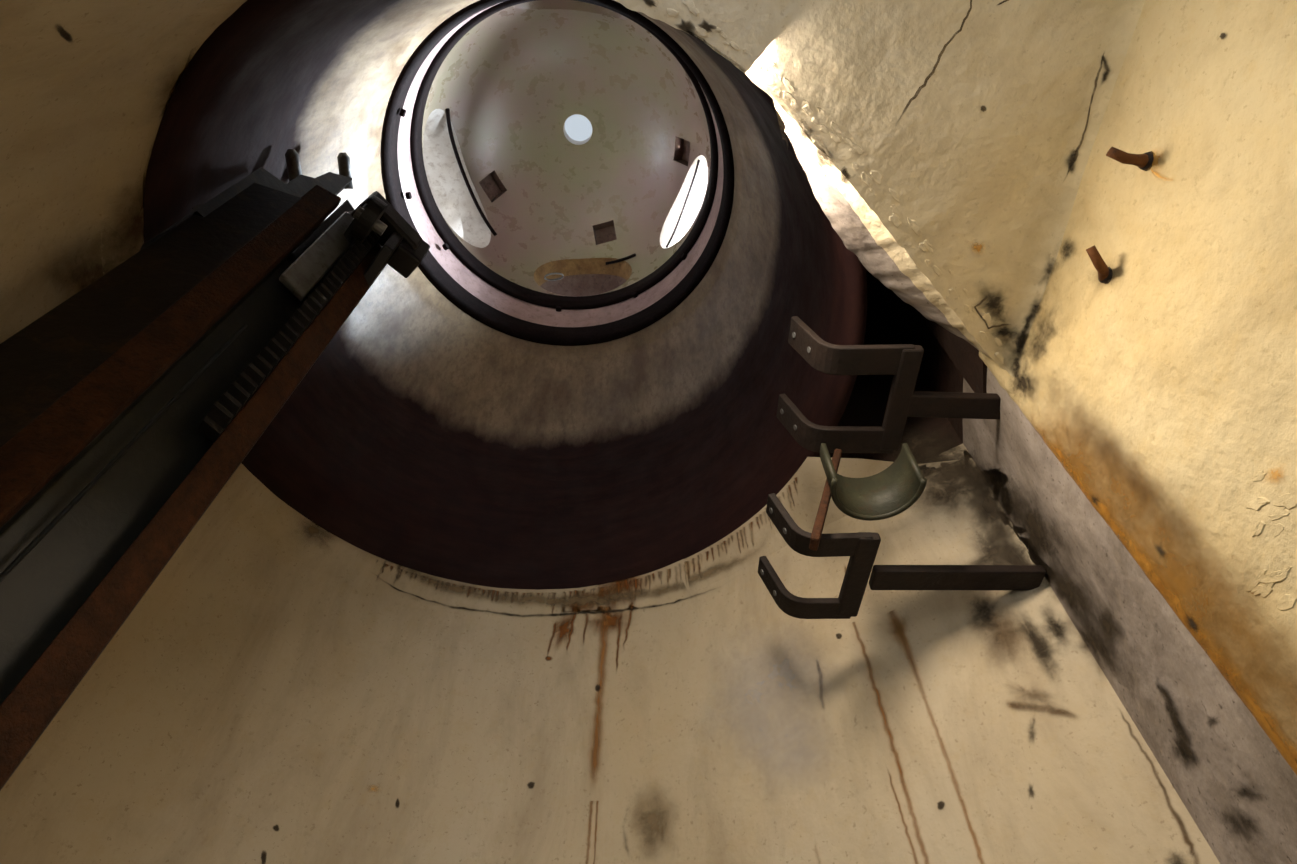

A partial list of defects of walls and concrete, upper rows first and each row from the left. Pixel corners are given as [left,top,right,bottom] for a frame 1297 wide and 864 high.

crack [900,0,1009,118]
crack [1067,56,1110,174]
damp [1046,242,1072,274]
damp [974,292,1053,392]
mould [893,431,1060,565]
rust [436,514,770,774]
mould [976,567,1119,669]
damp [1041,425,1297,775]
mould [1010,703,1071,715]
rust [586,801,598,864]
damp [639,809,667,845]